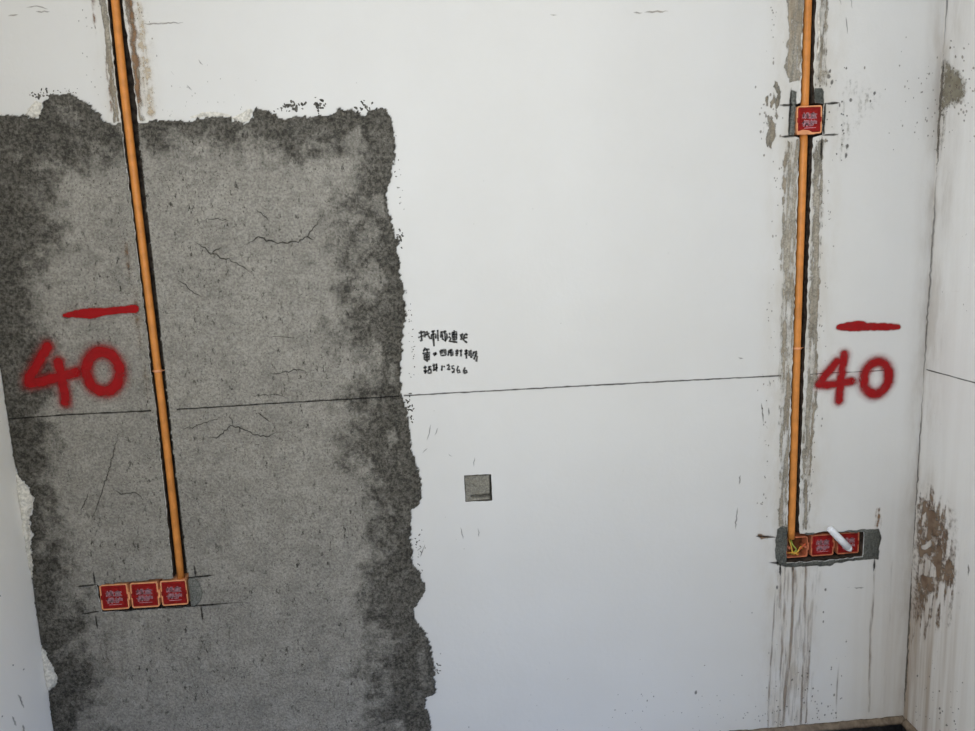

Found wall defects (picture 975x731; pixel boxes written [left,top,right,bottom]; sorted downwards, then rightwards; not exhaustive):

peeling [26,101,42,119]
peeling [190,109,253,123]
crack [251,211,320,244]
crack [197,243,247,270]
crack [183,369,306,438]
peeling [15,471,34,578]
peeling [41,645,58,692]